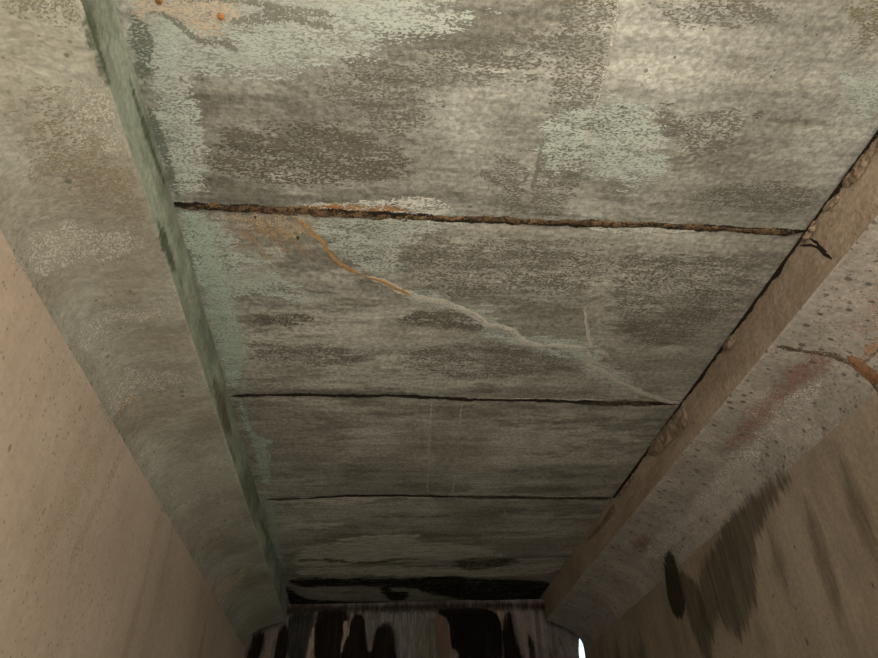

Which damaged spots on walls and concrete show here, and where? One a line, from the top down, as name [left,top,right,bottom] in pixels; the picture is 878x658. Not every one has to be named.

rust [209,203,413,274]
leakage [127,0,786,658]
crack [296,130,878,498]
leakage [723,350,836,452]